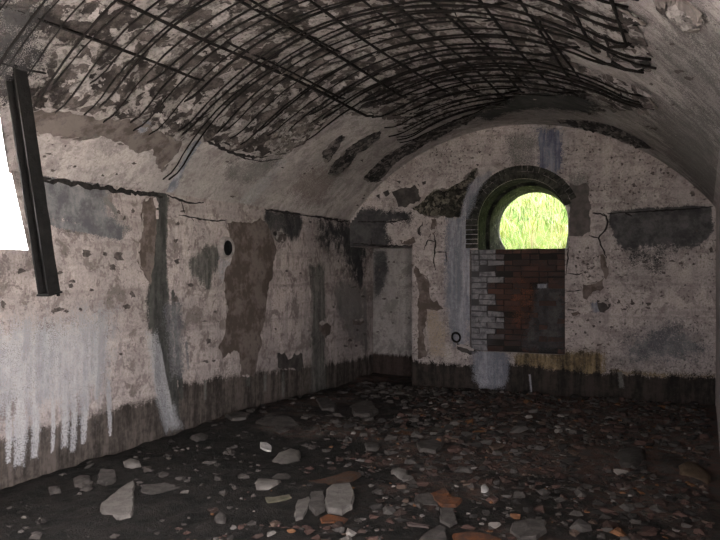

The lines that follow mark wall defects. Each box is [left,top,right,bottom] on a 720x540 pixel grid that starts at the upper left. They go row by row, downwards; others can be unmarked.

spalling [653,0,704,34]
spalling [0,0,658,183]
crack [43,177,226,222]
spalling [376,149,491,245]
crack [591,206,713,258]
peeling [203,218,286,377]
water stain [0,140,716,490]
peeling [408,264,443,359]